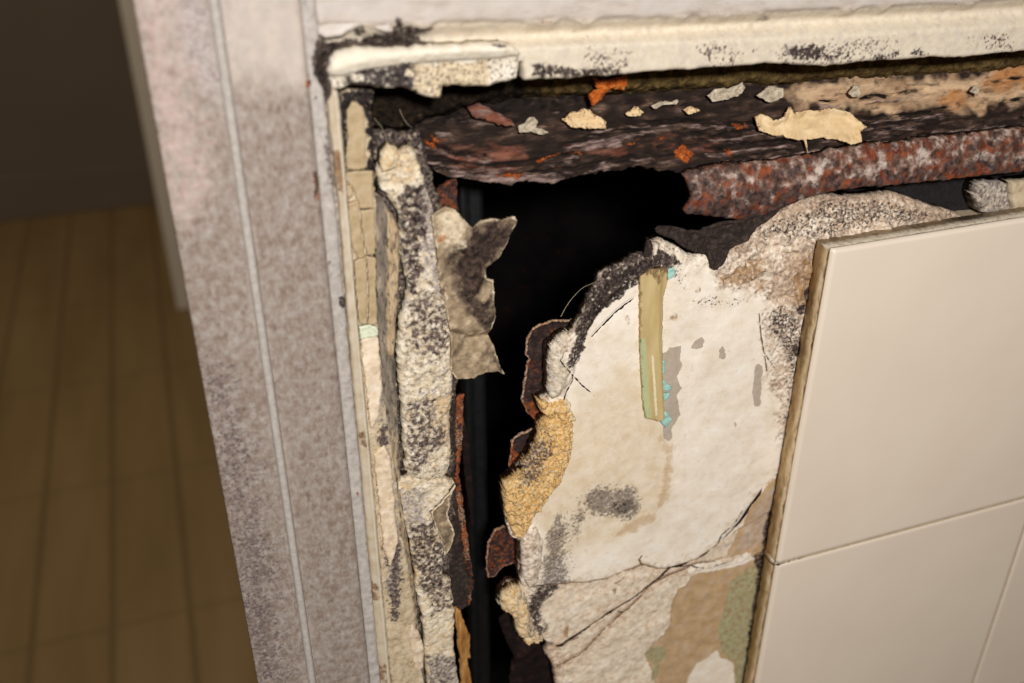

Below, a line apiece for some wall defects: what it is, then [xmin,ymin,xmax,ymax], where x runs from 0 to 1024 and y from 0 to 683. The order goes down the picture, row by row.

water stain [309,18,434,102]
water stain [532,63,620,78]
water stain [785,44,850,60]
peeling [562,108,606,130]
peeling [754,85,867,152]
rust [675,125,1024,220]
rust [507,317,573,469]
spalling [483,166,732,539]
rust [449,392,474,610]
rust [485,524,516,578]
crack [542,489,762,667]
peeling [645,479,776,683]